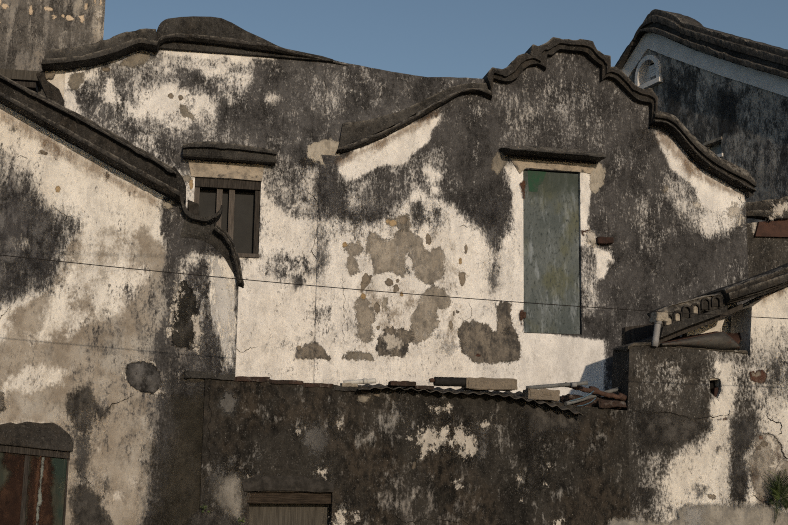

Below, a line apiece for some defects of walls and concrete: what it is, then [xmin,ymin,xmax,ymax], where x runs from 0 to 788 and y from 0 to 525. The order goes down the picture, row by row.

peeling [44,0,103,22]
leakage [0,171,61,291]
leakage [412,202,440,225]
peeling [342,213,522,365]
peeling [294,340,331,361]
spalling [750,370,767,384]
leakage [518,400,582,486]
leakage [728,414,756,508]
spalling [749,434,788,507]